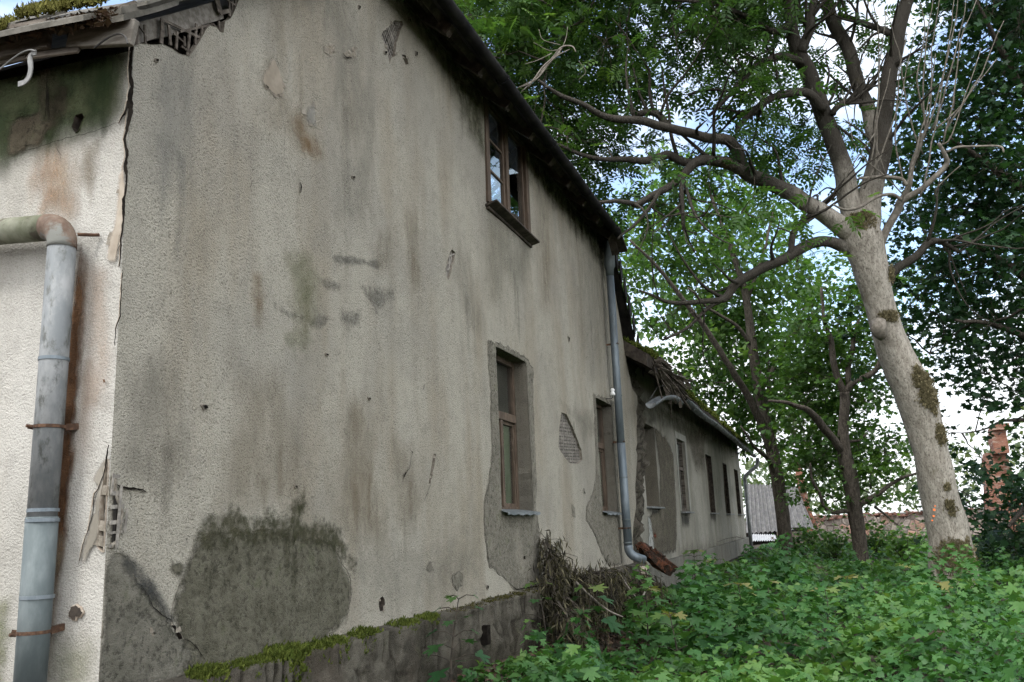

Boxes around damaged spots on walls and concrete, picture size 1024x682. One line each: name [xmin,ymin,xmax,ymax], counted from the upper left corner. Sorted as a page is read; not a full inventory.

flaking render [134,0,239,56]
flaking render [381,18,418,64]
crack [11,47,134,346]
corrosion [56,253,85,574]
crack [141,585,205,659]
flaking render [83,459,352,682]
flaking render [483,340,543,591]
flaking render [559,393,622,566]
flaking render [648,429,677,554]